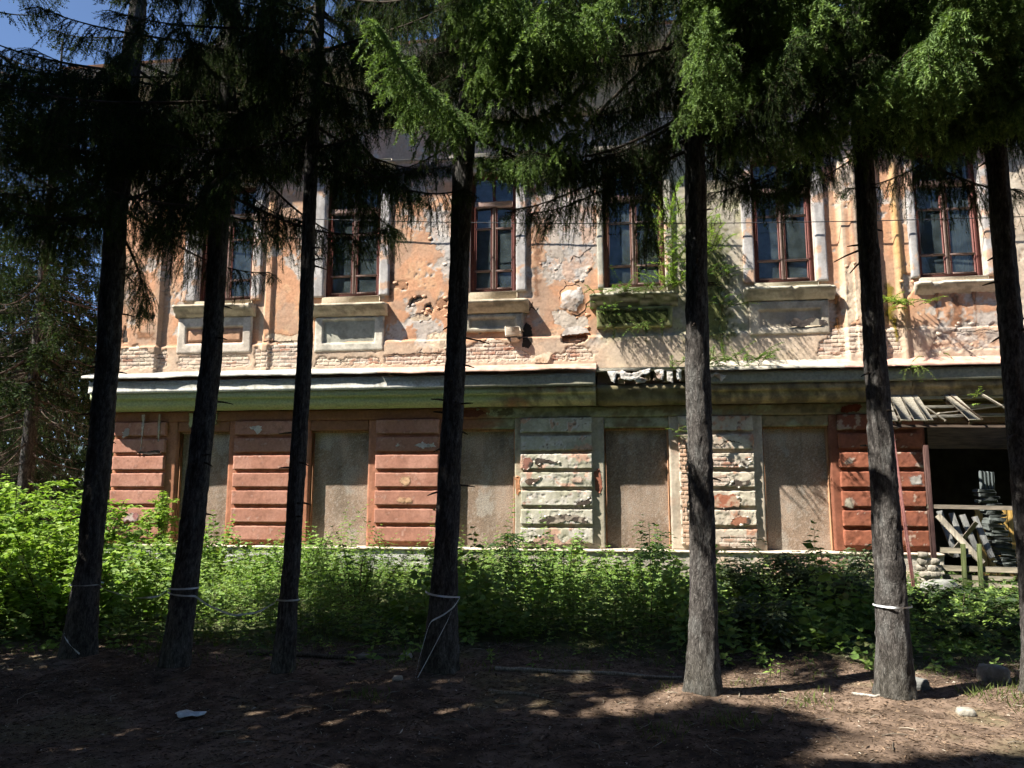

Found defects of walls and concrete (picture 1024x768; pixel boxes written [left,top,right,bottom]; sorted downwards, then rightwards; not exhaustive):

peeling [423,209,451,271]
flaking render [392,281,448,323]
flaking render [120,327,200,370]
flaking render [221,333,298,368]
flaking render [466,310,593,363]
flaking render [886,327,904,353]
flaking render [931,319,1000,353]
spalling [609,370,685,385]
peeling [515,458,560,495]
peeling [531,468,602,545]
flaking render [713,456,757,548]